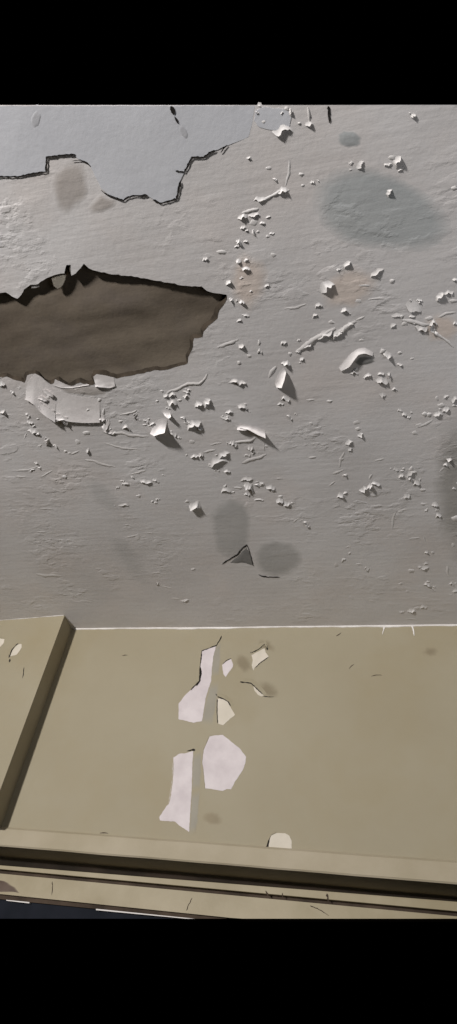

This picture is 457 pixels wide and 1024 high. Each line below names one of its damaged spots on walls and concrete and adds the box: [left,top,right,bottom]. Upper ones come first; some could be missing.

peeling [256,102,313,136]
leakage [338,130,362,148]
peeling [384,155,405,171]
leakage [311,166,452,253]
spalling [0,160,319,507]
peeling [268,261,395,420]
peeling [390,278,457,347]
peeling [329,420,381,498]
peeling [375,458,457,529]
leakage [210,498,303,579]
peeling [159,636,270,832]
peeling [264,831,292,848]